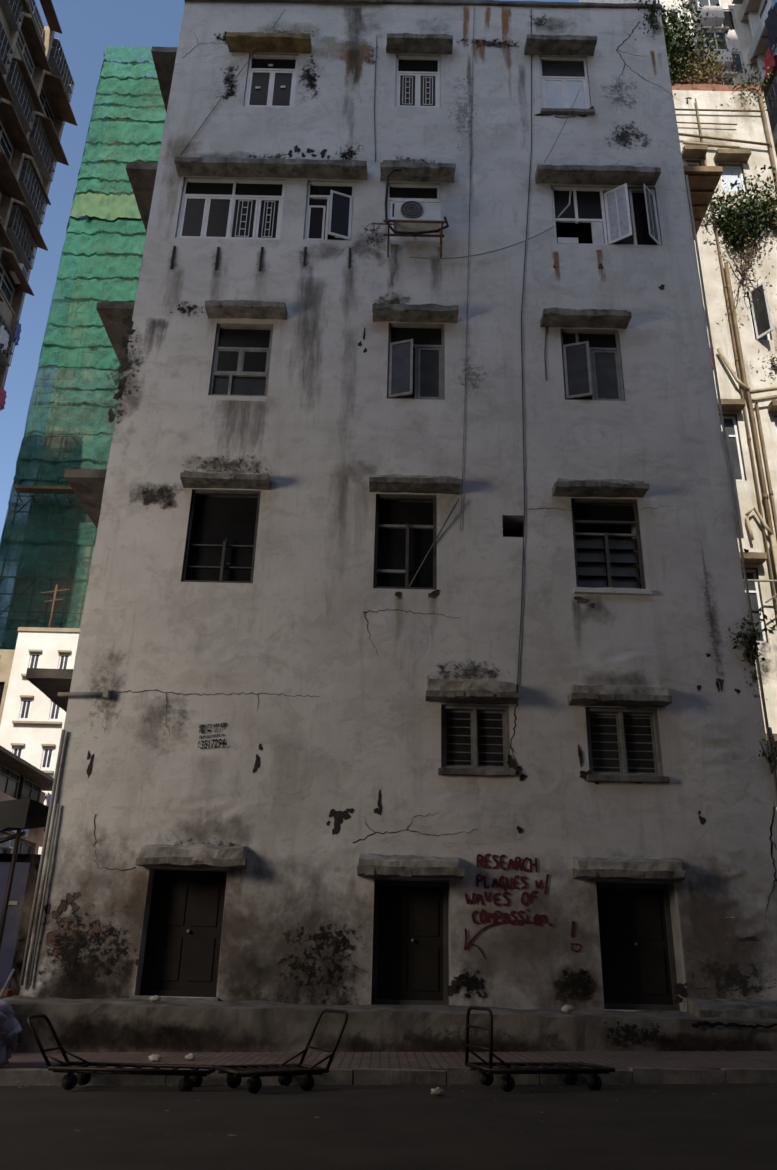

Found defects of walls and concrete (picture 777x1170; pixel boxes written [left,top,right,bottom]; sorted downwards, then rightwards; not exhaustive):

rust [318,38,373,80]
rust [463,7,484,59]
rust [485,7,511,65]
leakage [105,332,143,424]
crack [363,609,461,655]
crack [111,689,318,737]
crack [353,813,476,843]
leakage [27,906,138,999]
leakage [238,919,366,1005]